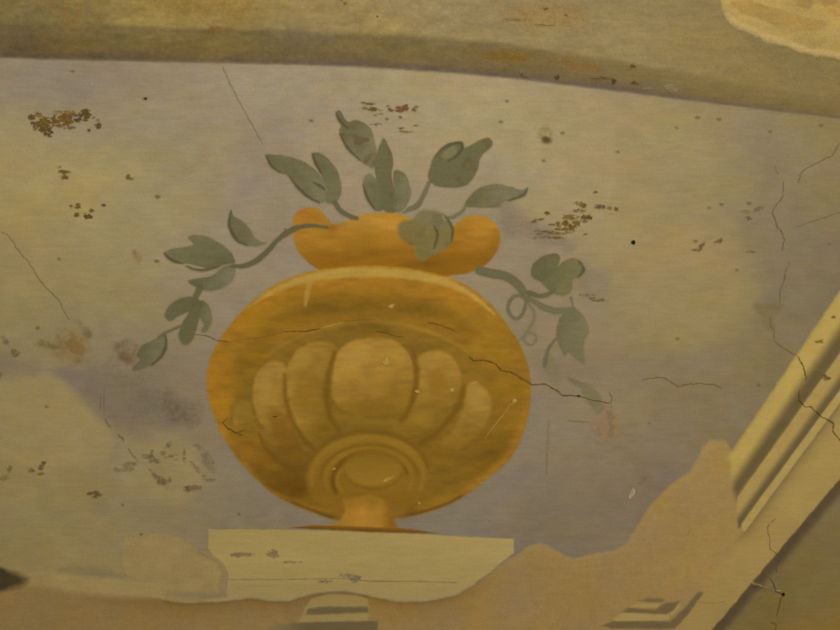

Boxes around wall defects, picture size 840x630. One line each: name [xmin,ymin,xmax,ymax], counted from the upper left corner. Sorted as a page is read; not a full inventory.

peeling [718,0,840,61]
peeling [27,108,102,138]
peeling [358,101,420,133]
peeling [530,201,618,240]
crack [770,143,840,441]
crack [195,319,404,343]
crack [470,357,613,408]
crack [642,377,722,388]
flaking render [0,439,742,630]
crack [767,517,783,630]